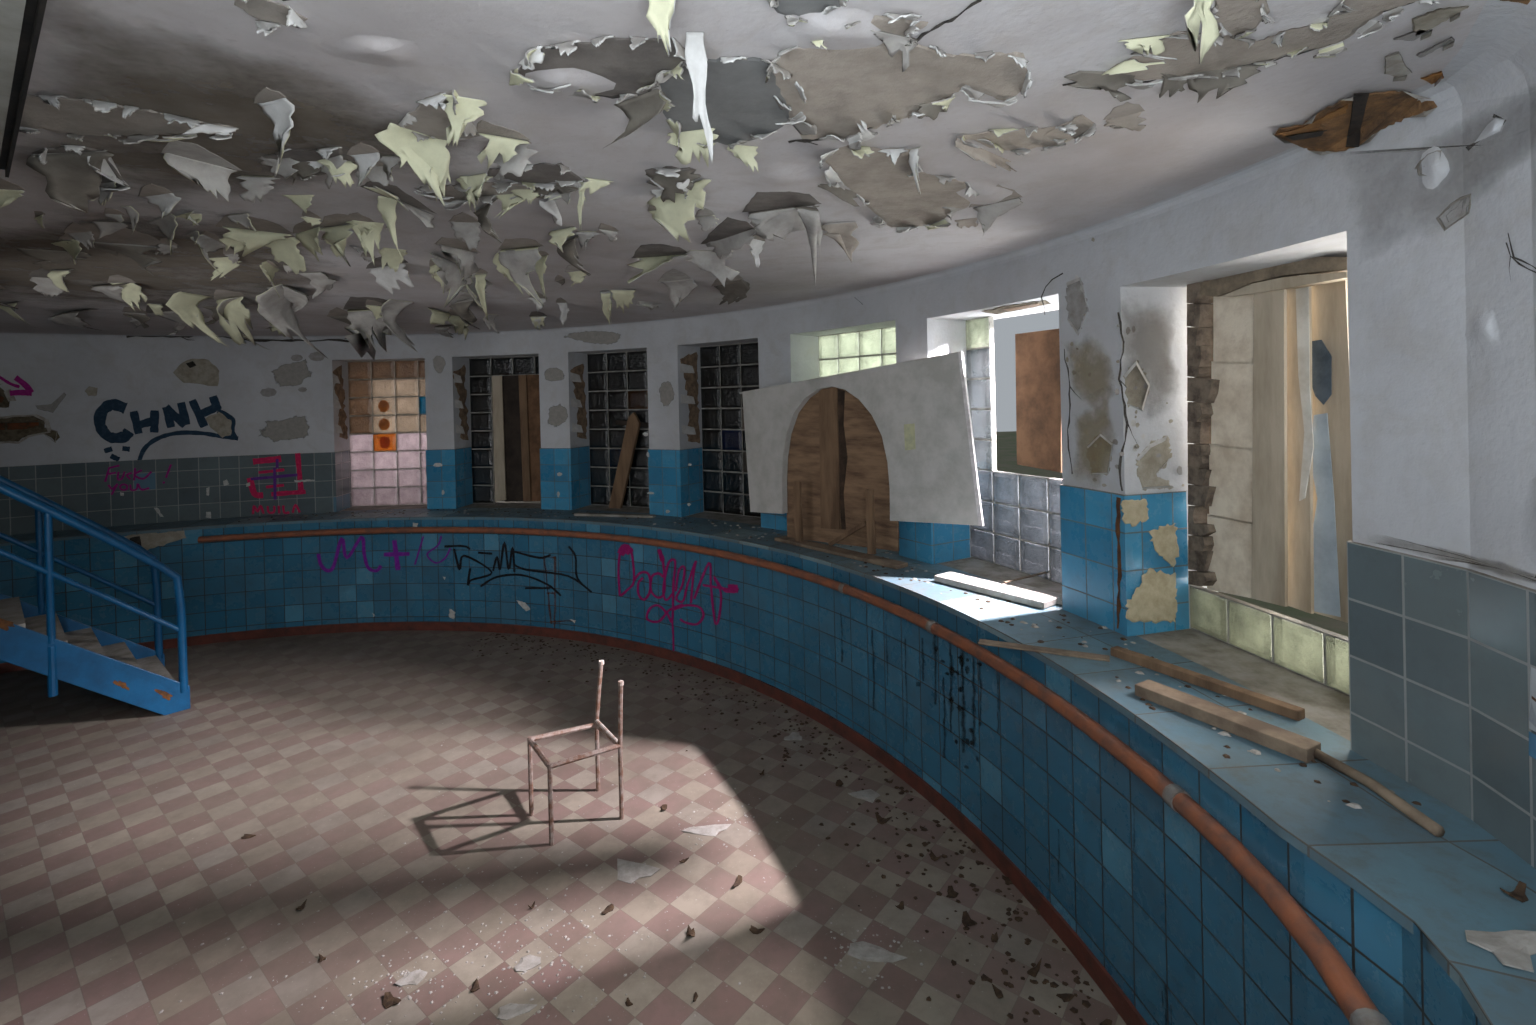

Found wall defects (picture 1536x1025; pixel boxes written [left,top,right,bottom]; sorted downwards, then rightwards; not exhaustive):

peeling [0,0,1472,444]
crack [1506,233,1536,280]
spalling [1084,280,1220,624]
damp [872,630,999,769]